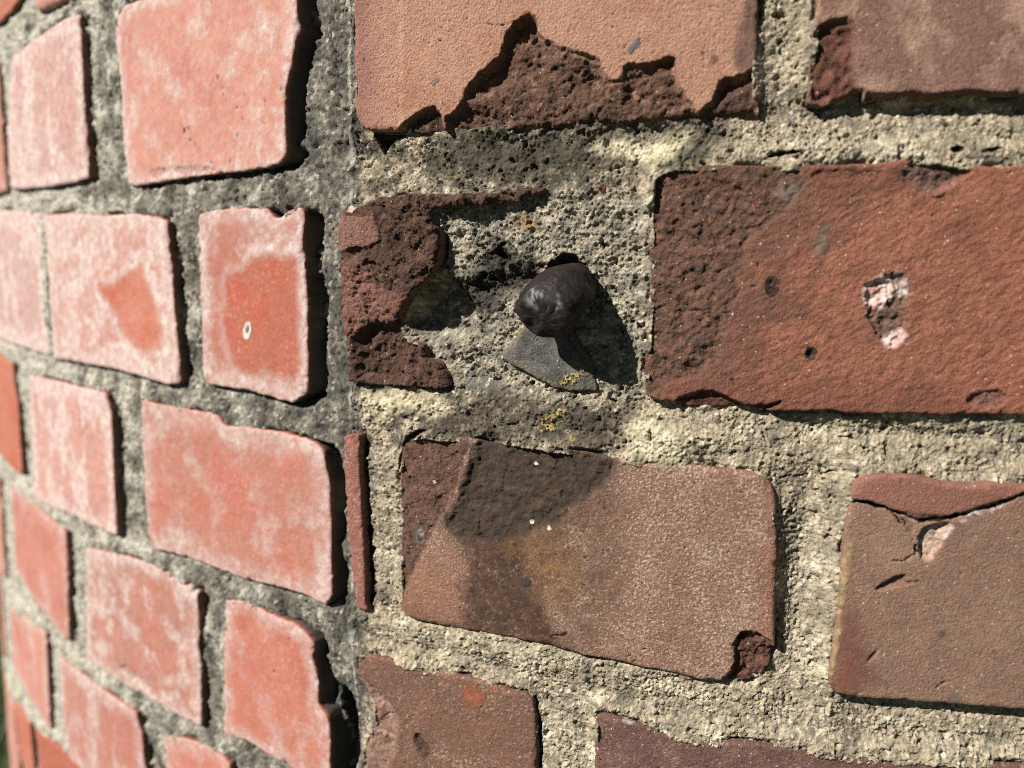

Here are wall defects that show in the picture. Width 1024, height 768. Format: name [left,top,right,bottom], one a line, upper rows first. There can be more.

spalling [398,12,759,135]
spalling [340,188,545,389]
crack [854,493,1024,561]
spalling [721,630,775,680]